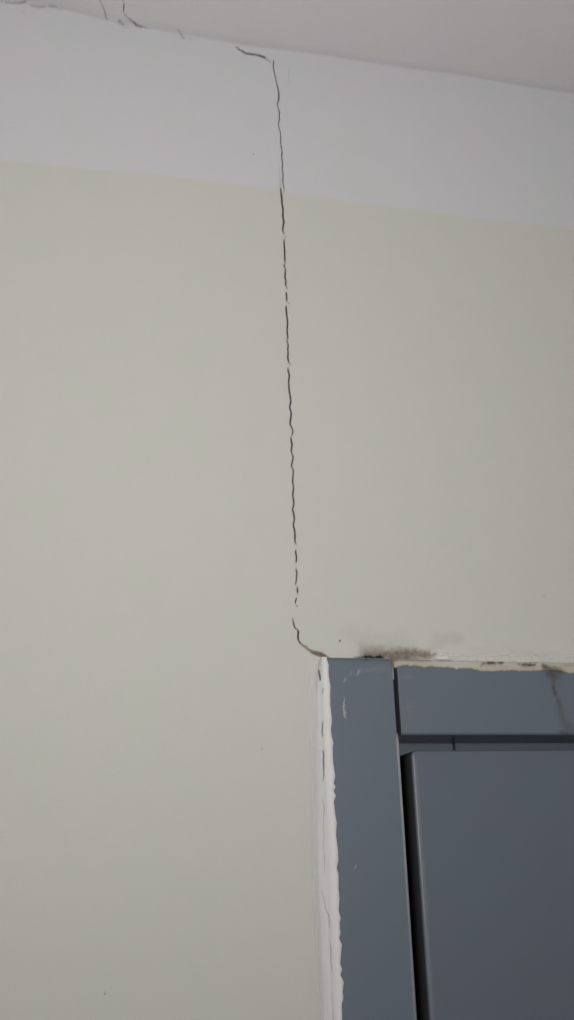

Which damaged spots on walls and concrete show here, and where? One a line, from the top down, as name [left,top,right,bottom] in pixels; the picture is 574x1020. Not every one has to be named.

crack [247,53,326,680]